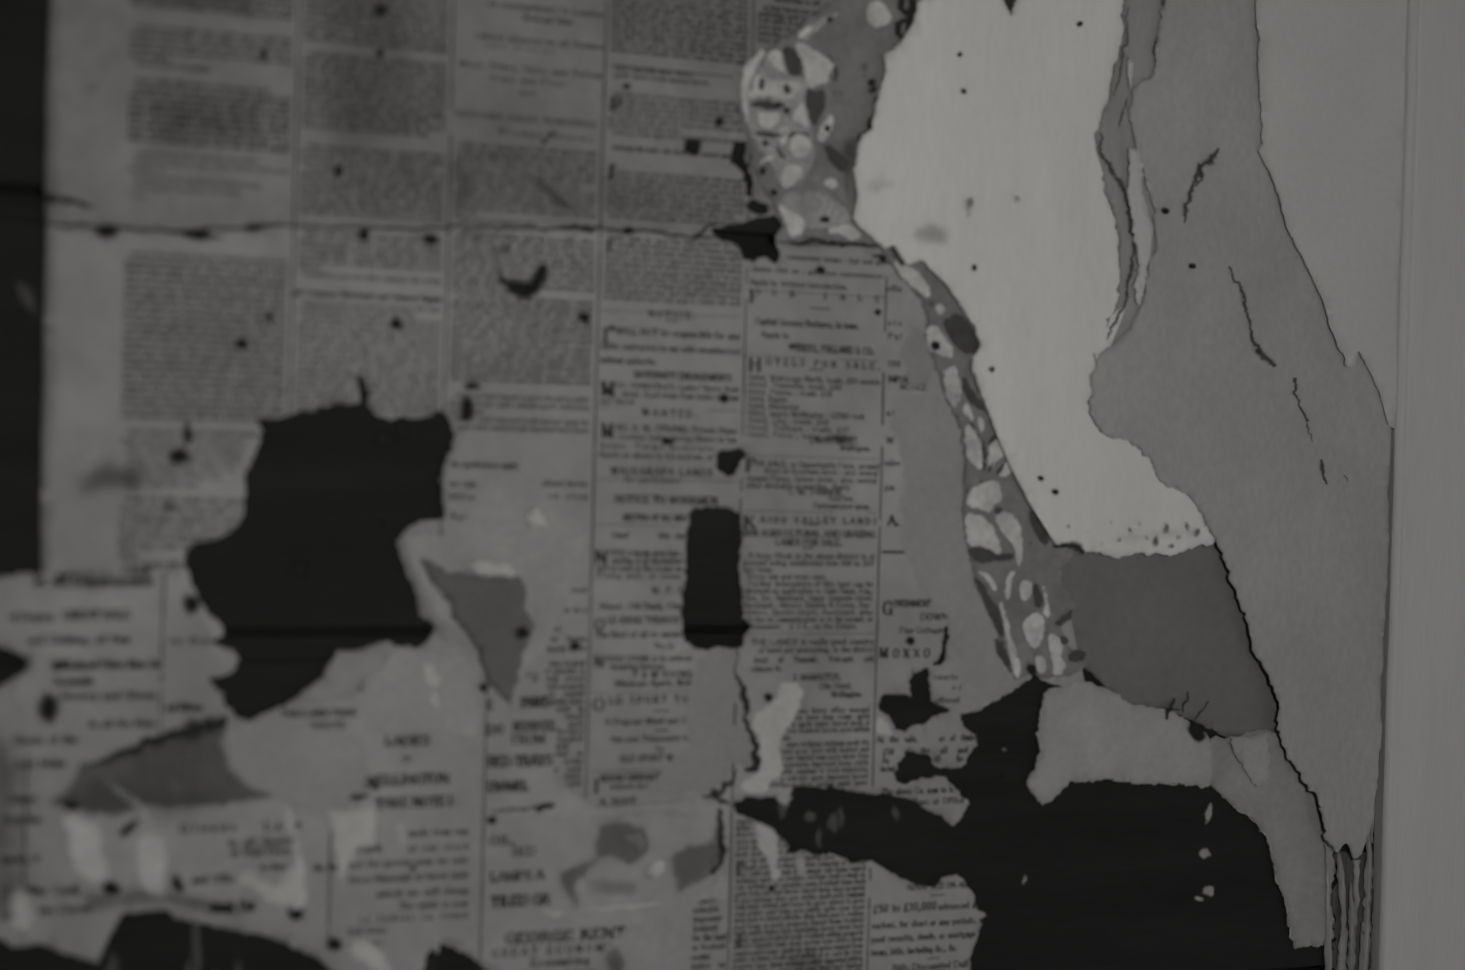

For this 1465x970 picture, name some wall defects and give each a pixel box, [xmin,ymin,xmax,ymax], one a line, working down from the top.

peeling [0,0,50,578]
crack [45,193,716,240]
spalling [709,141,784,263]
crack [1098,0,1164,339]
peeling [1126,148,1154,305]
crack [1184,148,1219,223]
crack [1229,266,1348,484]
spalling [45,374,590,910]
spalling [679,506,751,653]
spalling [732,369,1336,970]
spalling [0,830,329,970]
spalling [423,943,490,970]